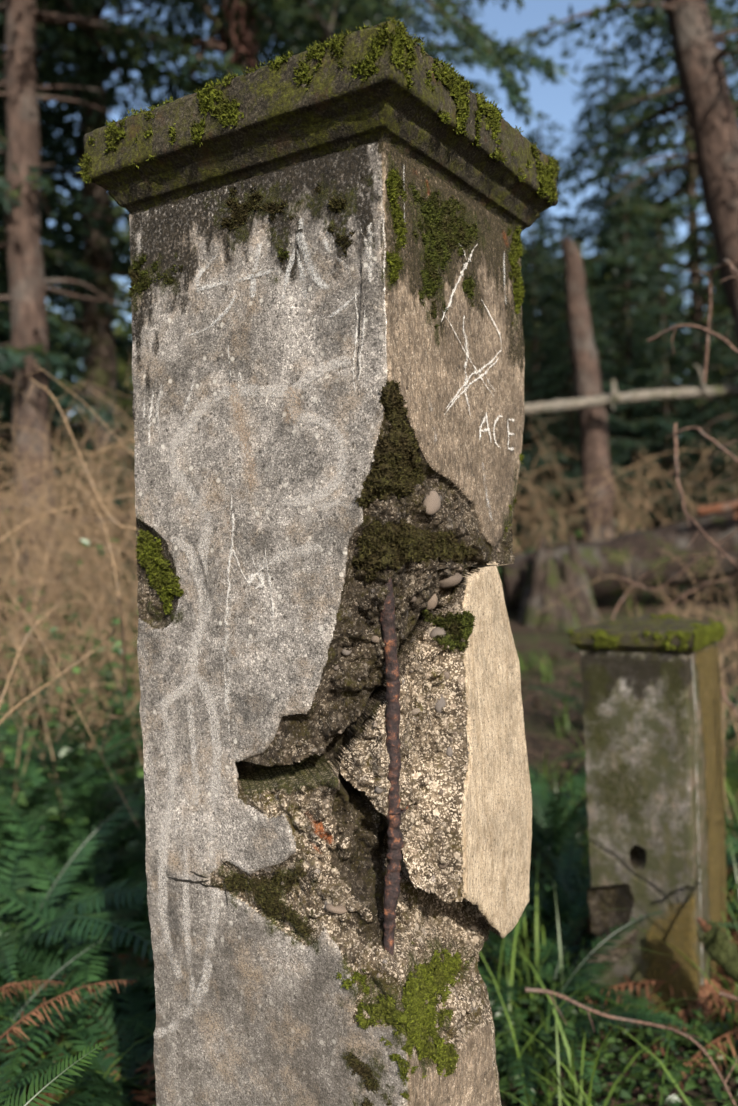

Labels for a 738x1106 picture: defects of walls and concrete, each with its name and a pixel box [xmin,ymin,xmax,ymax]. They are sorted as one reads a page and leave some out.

damp [129,140,525,388]
spalling [235,410,515,767]